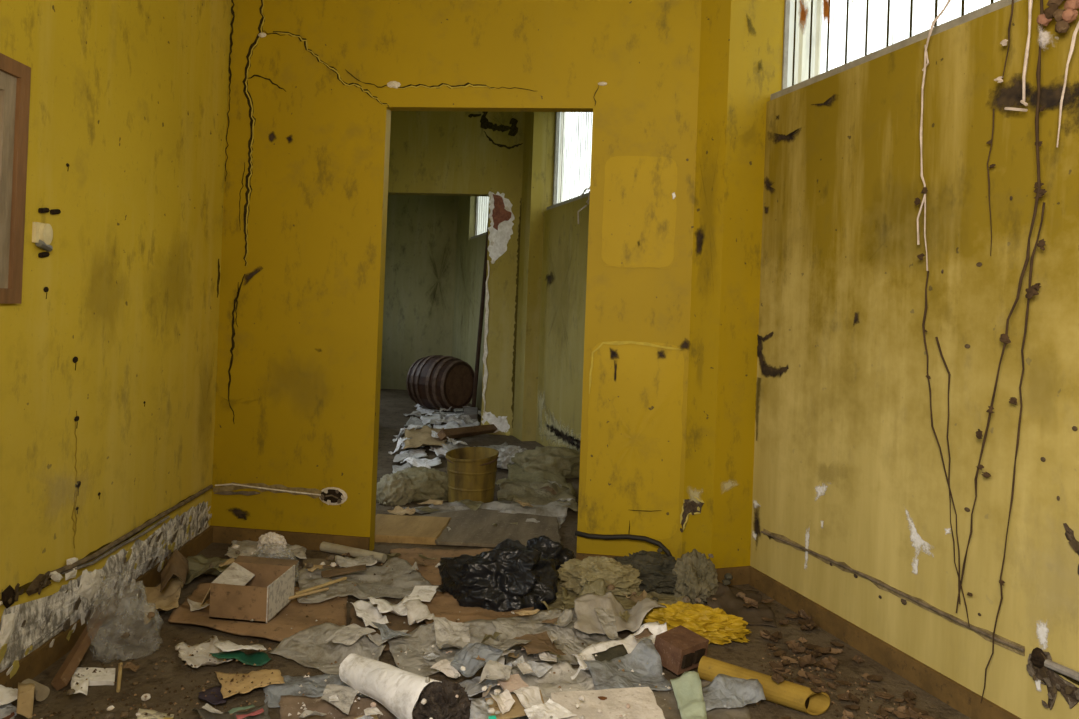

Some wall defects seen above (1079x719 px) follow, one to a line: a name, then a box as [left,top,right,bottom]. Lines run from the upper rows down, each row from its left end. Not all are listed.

leakage [992,77,1079,121]
crack [217,0,533,428]
spalling [482,192,515,436]
spalling [0,501,212,679]
spalling [1026,647,1079,710]
spalling [1063,523,1079,575]